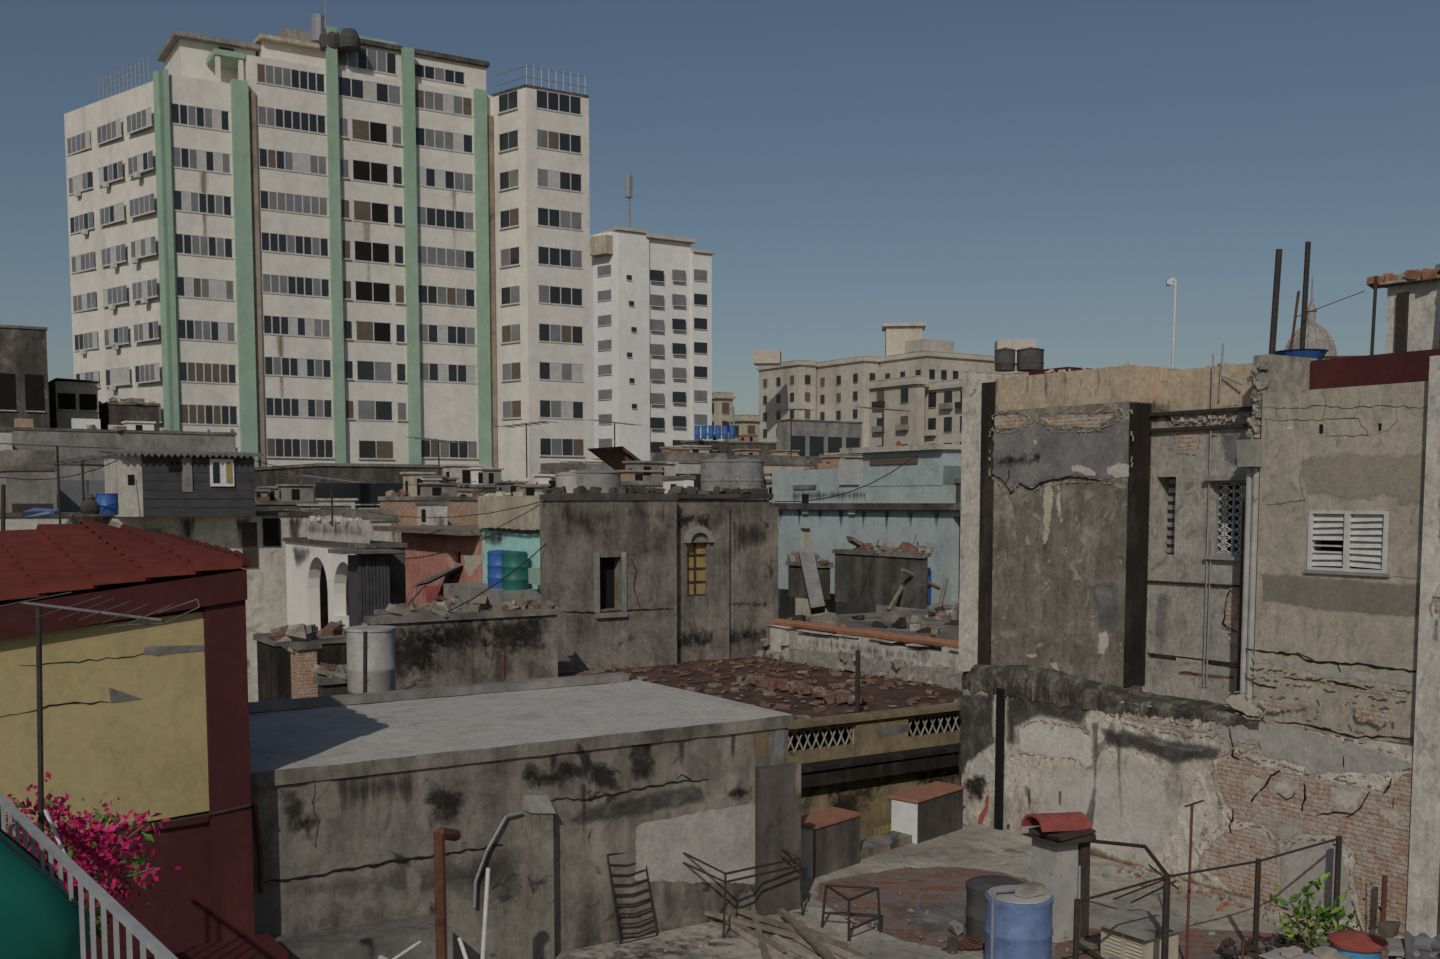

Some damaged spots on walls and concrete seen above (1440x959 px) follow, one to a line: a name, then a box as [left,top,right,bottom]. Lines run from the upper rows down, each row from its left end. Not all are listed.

flaking render [992,408,1123,445]
peeling [1071,463,1129,500]
crack [1,701,109,717]
crack [23,653,144,666]
peeling [1220,691,1322,723]
crack [1222,590,1417,767]
crack [264,781,502,883]
leakage [524,753,702,823]
leakage [631,744,654,779]
peeling [1018,719,1177,864]
flaking render [1196,740,1413,938]
crack [1229,770,1394,833]